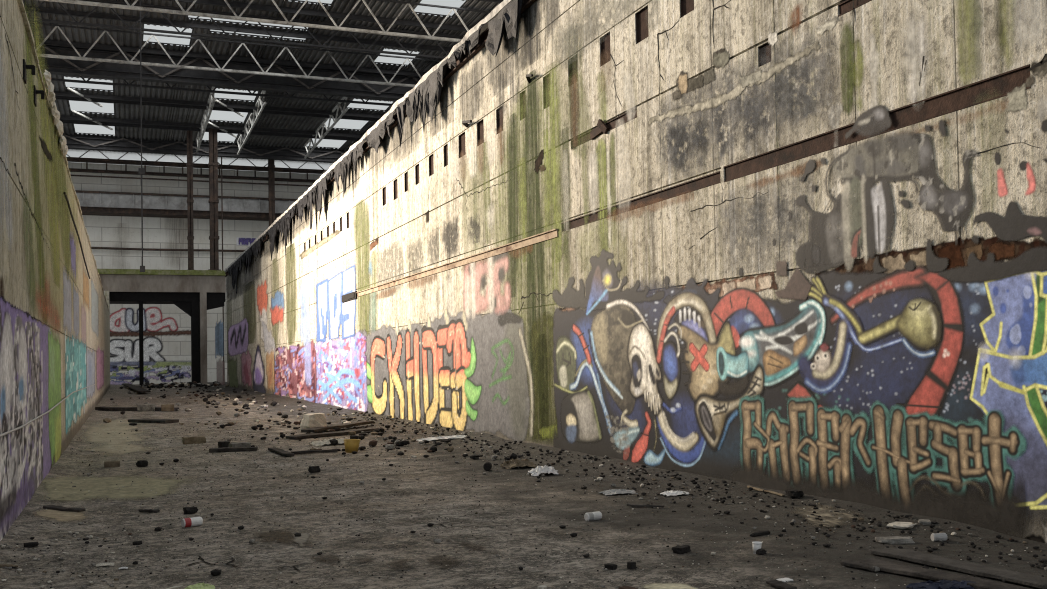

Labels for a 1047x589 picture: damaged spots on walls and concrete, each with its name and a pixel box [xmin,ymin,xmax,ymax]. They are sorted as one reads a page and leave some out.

damp [24,26,98,342]
damp [509,70,570,440]
flaking render [698,272,777,298]